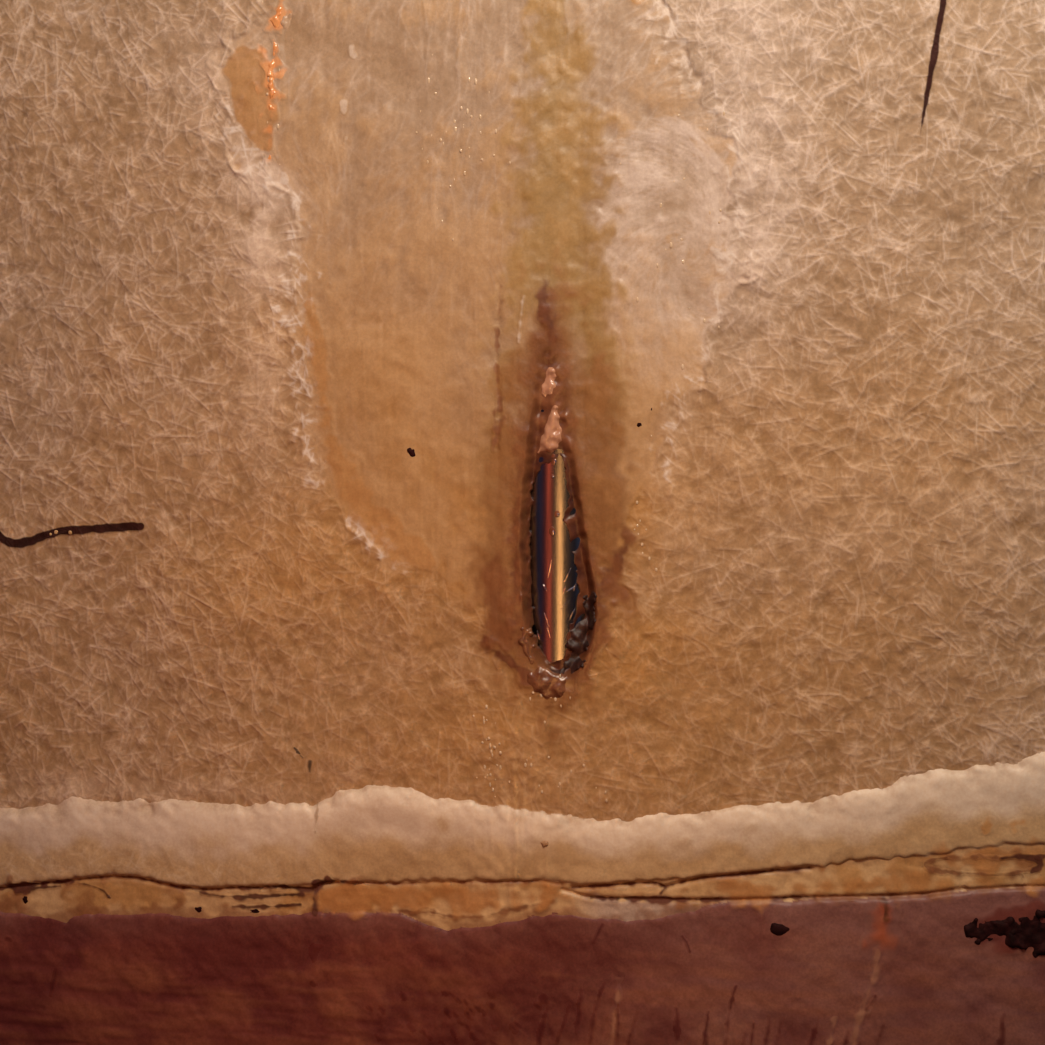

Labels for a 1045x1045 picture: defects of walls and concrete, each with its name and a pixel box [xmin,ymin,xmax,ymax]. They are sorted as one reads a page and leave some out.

peeling [206,0,512,594]
corrosion [439,225,674,754]
hole [502,332,615,700]
peeling [602,0,764,490]